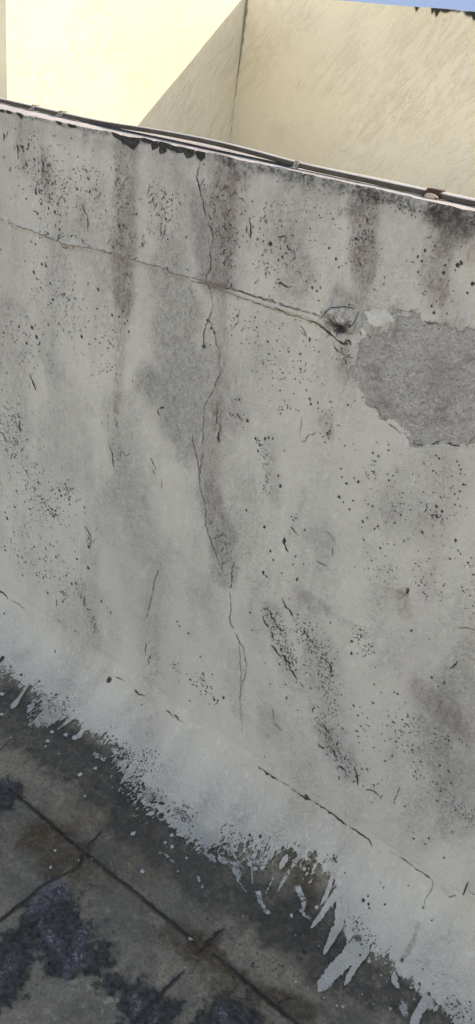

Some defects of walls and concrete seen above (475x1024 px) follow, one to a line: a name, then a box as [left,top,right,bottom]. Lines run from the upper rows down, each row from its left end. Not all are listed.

crack [0,131,352,731]
peeling [331,304,475,448]
leakage [0,689,423,1024]
crack [258,767,475,904]